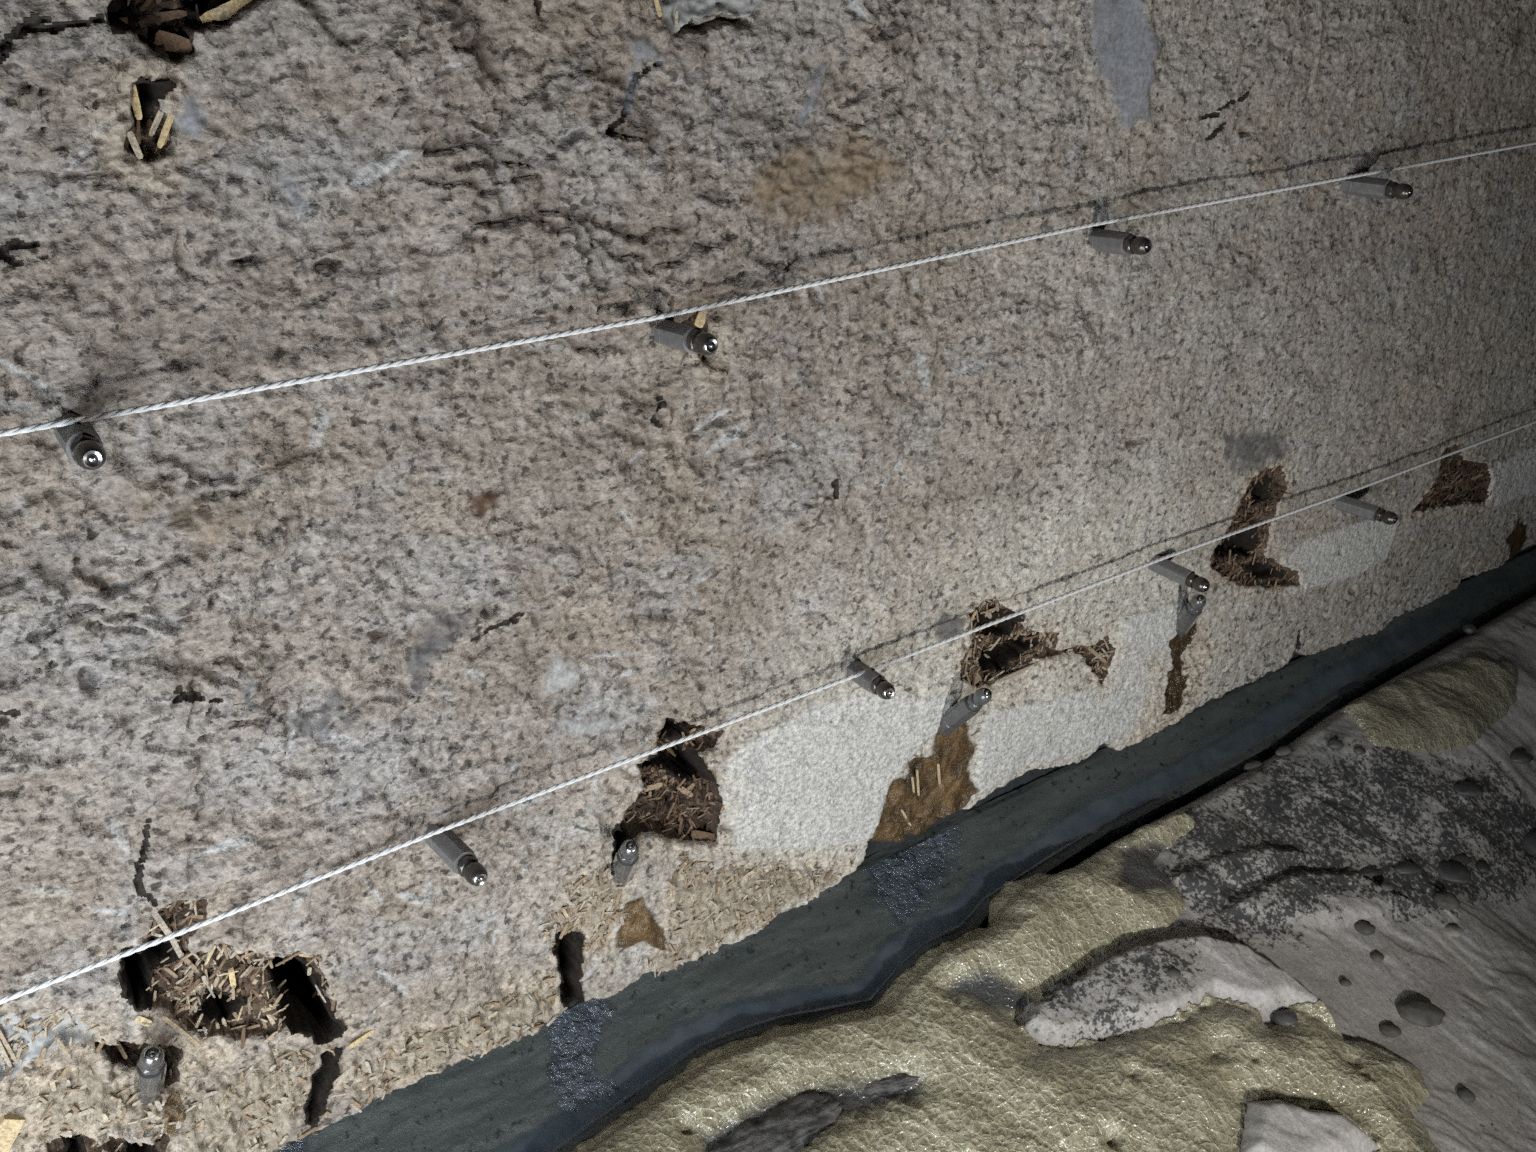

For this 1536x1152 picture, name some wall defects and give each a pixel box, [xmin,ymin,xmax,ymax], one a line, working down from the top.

crack [0,14,105,65]
spalling [107,0,264,159]
crack [1201,91,1250,141]
crack [0,238,40,267]
spalling [1210,464,1300,594]
crack [471,613,525,642]
spalling [960,599,1116,688]
crack [172,686,223,704]
spalling [611,718,725,875]
crack [133,819,158,907]
spalling [0,899,374,1088]
spalling [45,1132,170,1152]